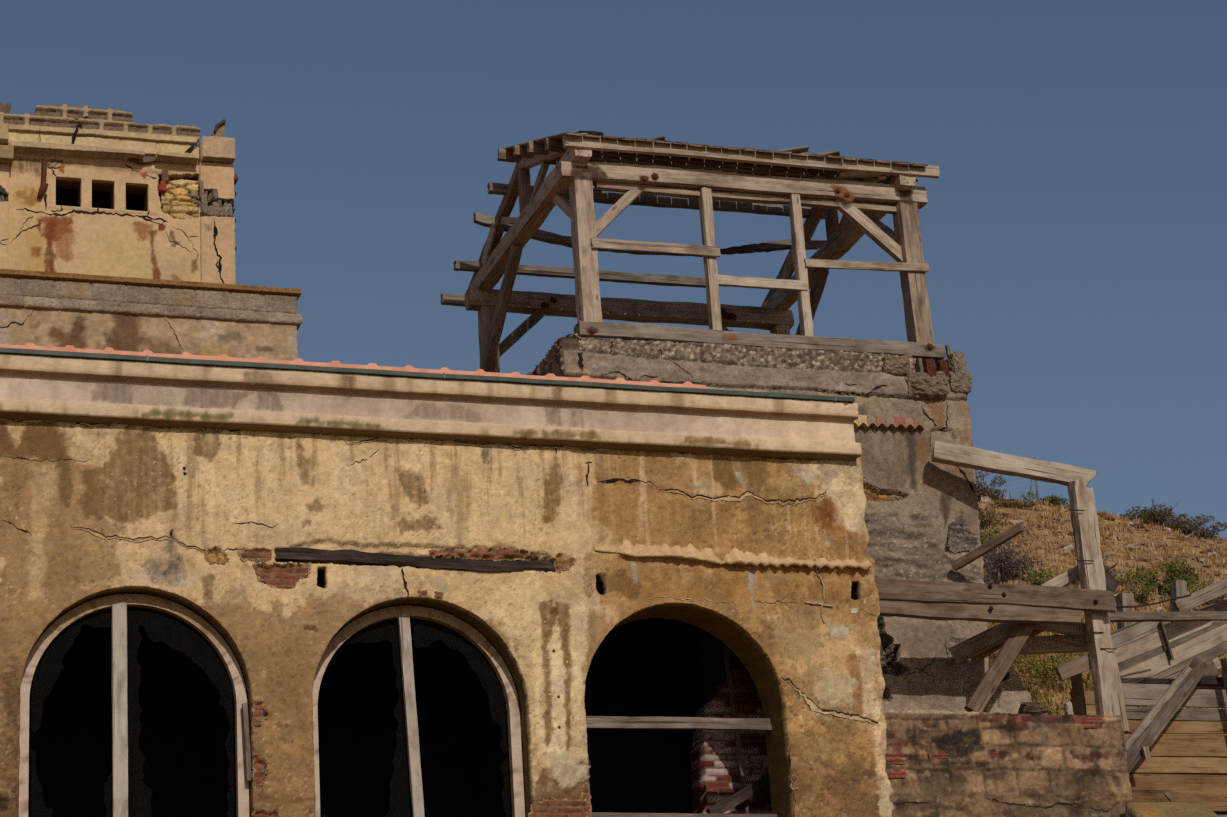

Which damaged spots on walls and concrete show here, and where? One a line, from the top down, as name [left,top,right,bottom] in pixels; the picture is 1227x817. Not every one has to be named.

crack [1,133,224,284]
spalling [157,168,235,220]
corrosion [33,215,73,272]
corrosion [134,222,179,281]
crack [0,306,41,328]
leakage [0,421,175,522]
crack [338,437,831,505]
crack [70,521,277,552]
spalling [204,545,311,588]
spalling [429,546,577,572]
leakage [540,600,571,750]
flaking render [782,617,907,725]